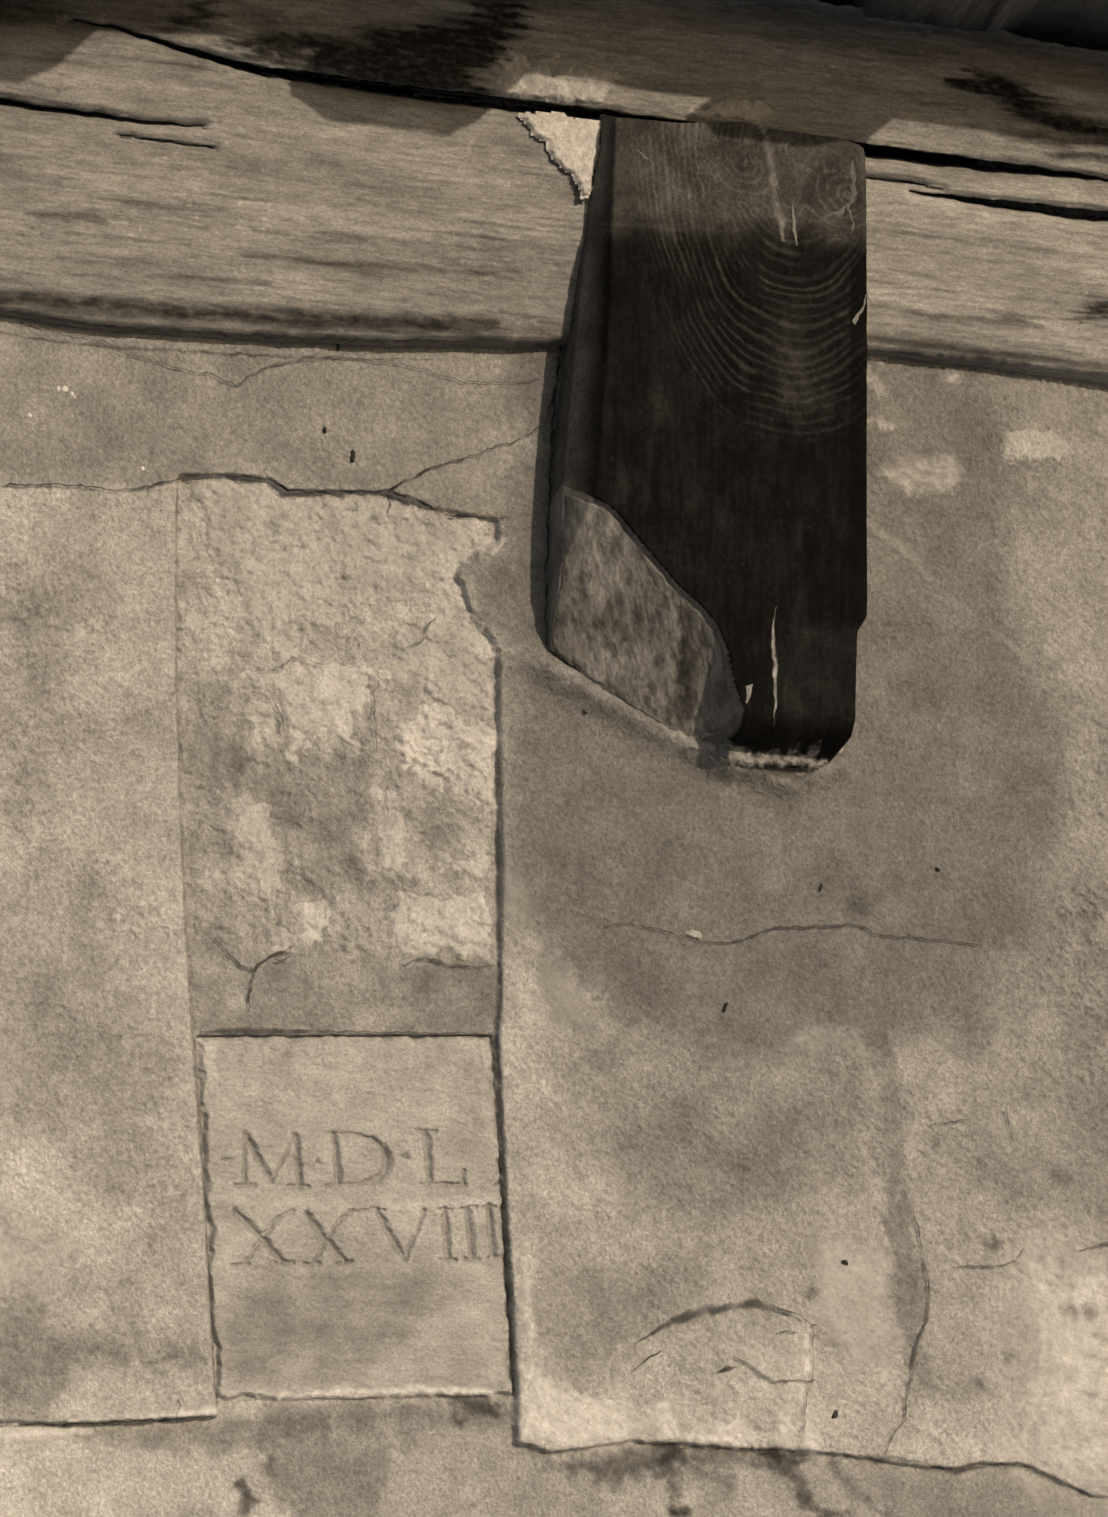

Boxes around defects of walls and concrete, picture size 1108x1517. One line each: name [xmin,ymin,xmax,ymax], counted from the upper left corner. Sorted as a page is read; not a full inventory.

leakage [228,3,530,95]
crack [0,264,591,645]
flaking render [1000,428,1070,465]
crack [603,923,980,946]